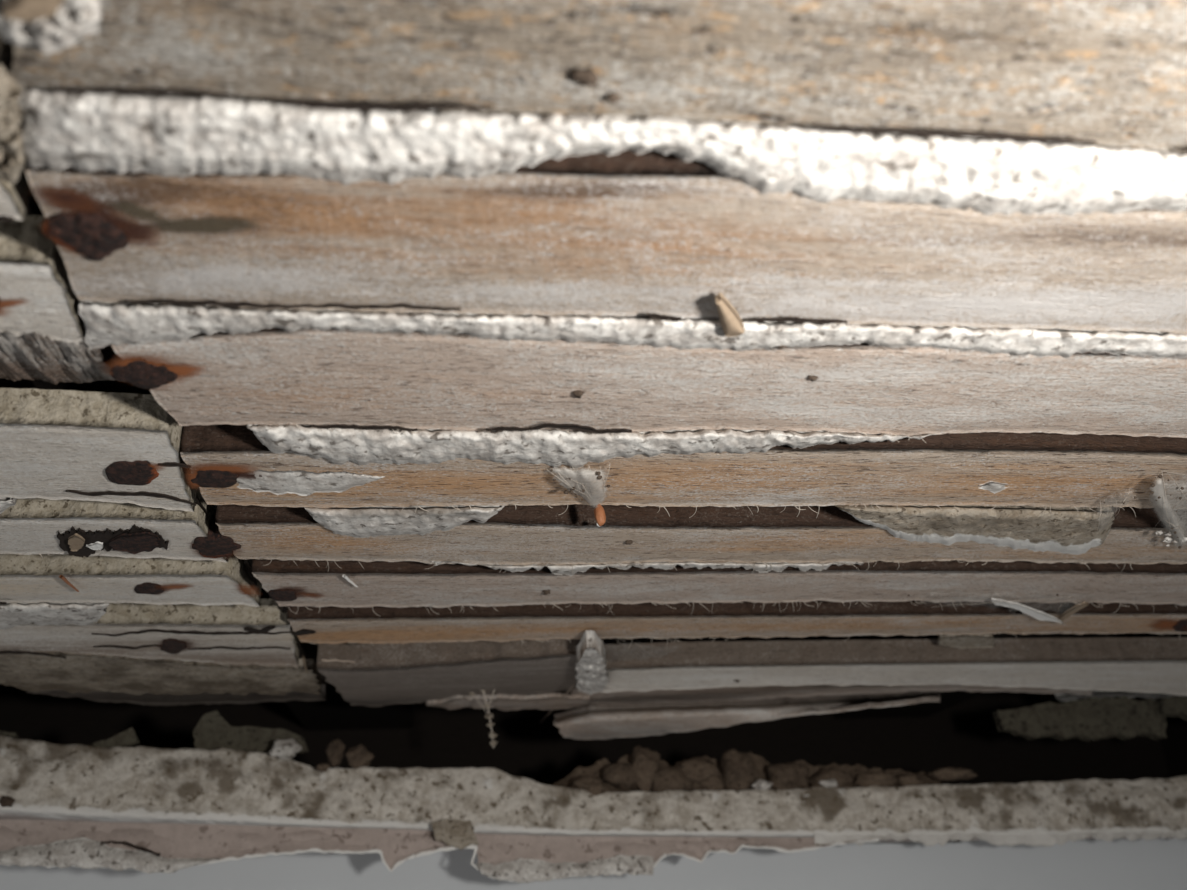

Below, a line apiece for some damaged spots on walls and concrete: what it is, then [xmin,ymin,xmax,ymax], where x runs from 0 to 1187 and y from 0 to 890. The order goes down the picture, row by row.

spalling [0,0,1187,216]
rust [42,189,158,246]
rust [0,300,24,316]
spalling [79,300,1187,358]
rust [111,358,202,377]
rust [186,465,262,487]
spalling [237,424,937,538]
spalling [834,504,1115,555]
rust [154,584,191,593]
rust [280,588,322,598]
spalling [0,650,322,695]
peeling [0,819,1187,883]